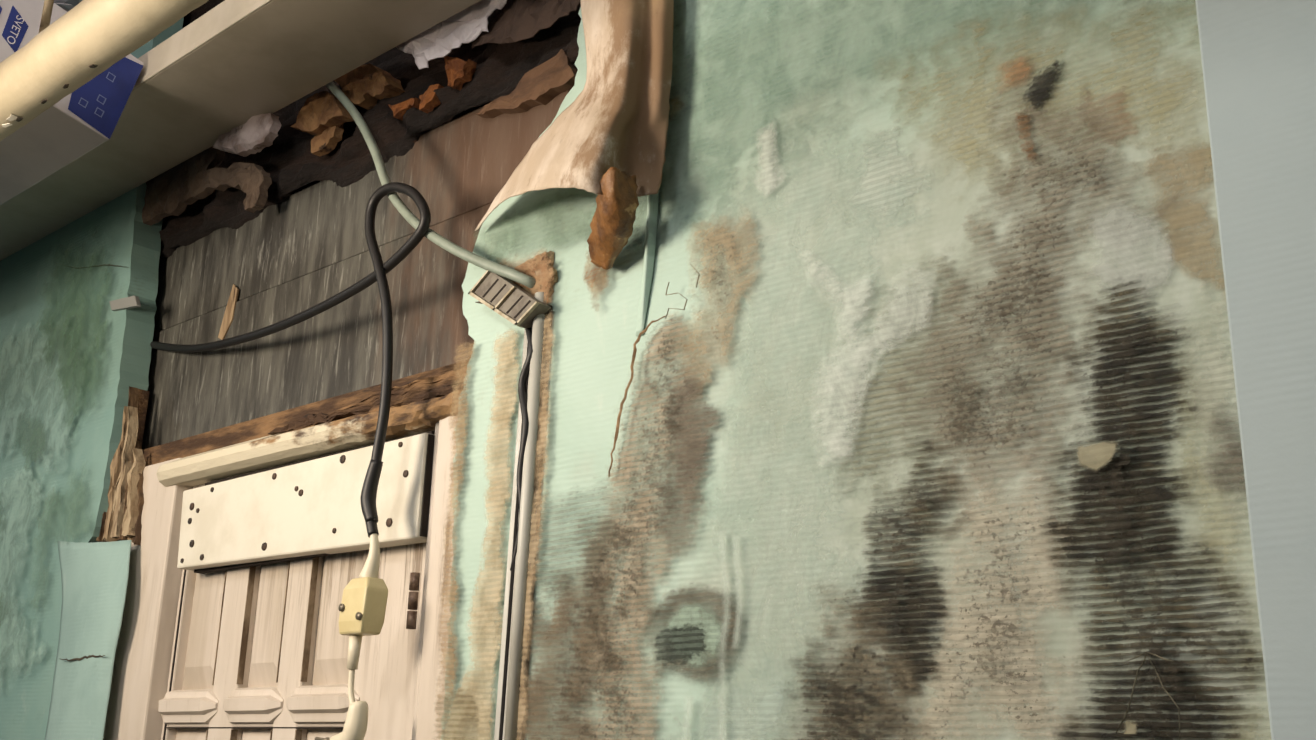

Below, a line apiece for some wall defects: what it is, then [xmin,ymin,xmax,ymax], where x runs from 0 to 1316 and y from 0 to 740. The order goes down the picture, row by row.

water stain [0,250,109,670]
spalling [142,113,281,226]
crack [665,264,700,319]
water stain [521,0,1264,740]